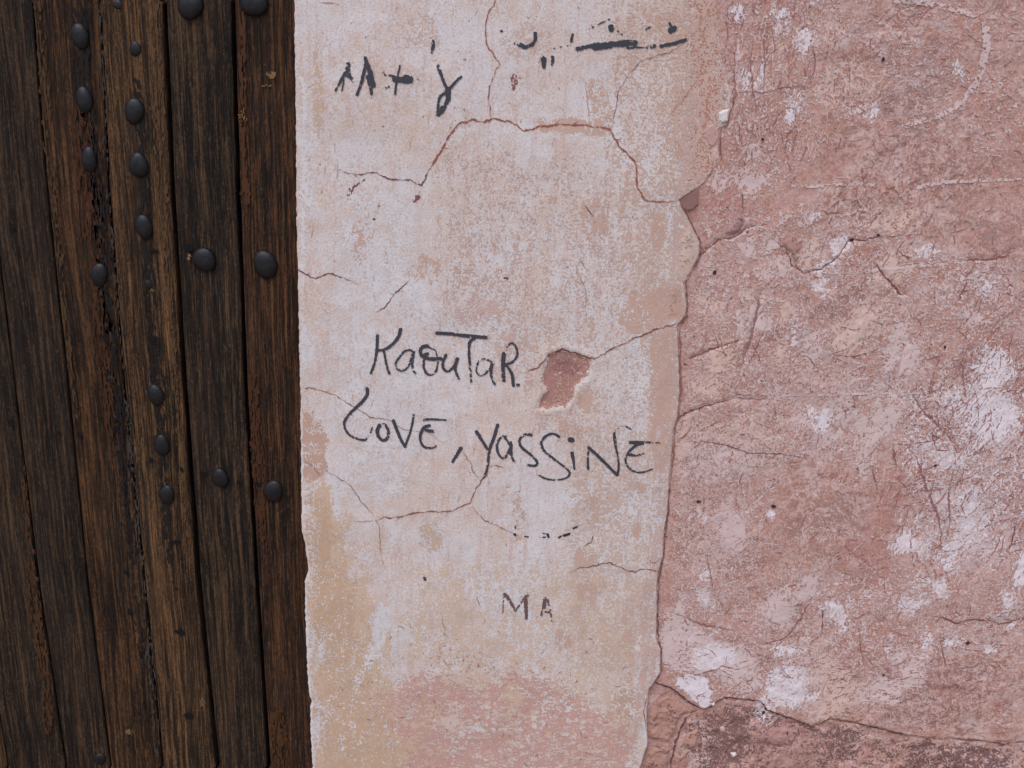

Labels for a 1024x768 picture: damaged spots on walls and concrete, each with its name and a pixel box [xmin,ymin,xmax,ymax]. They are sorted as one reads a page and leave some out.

spalling [680,188,700,209]
spalling [538,350,590,409]
crack [298,0,918,752]
spalling [674,704,1024,768]